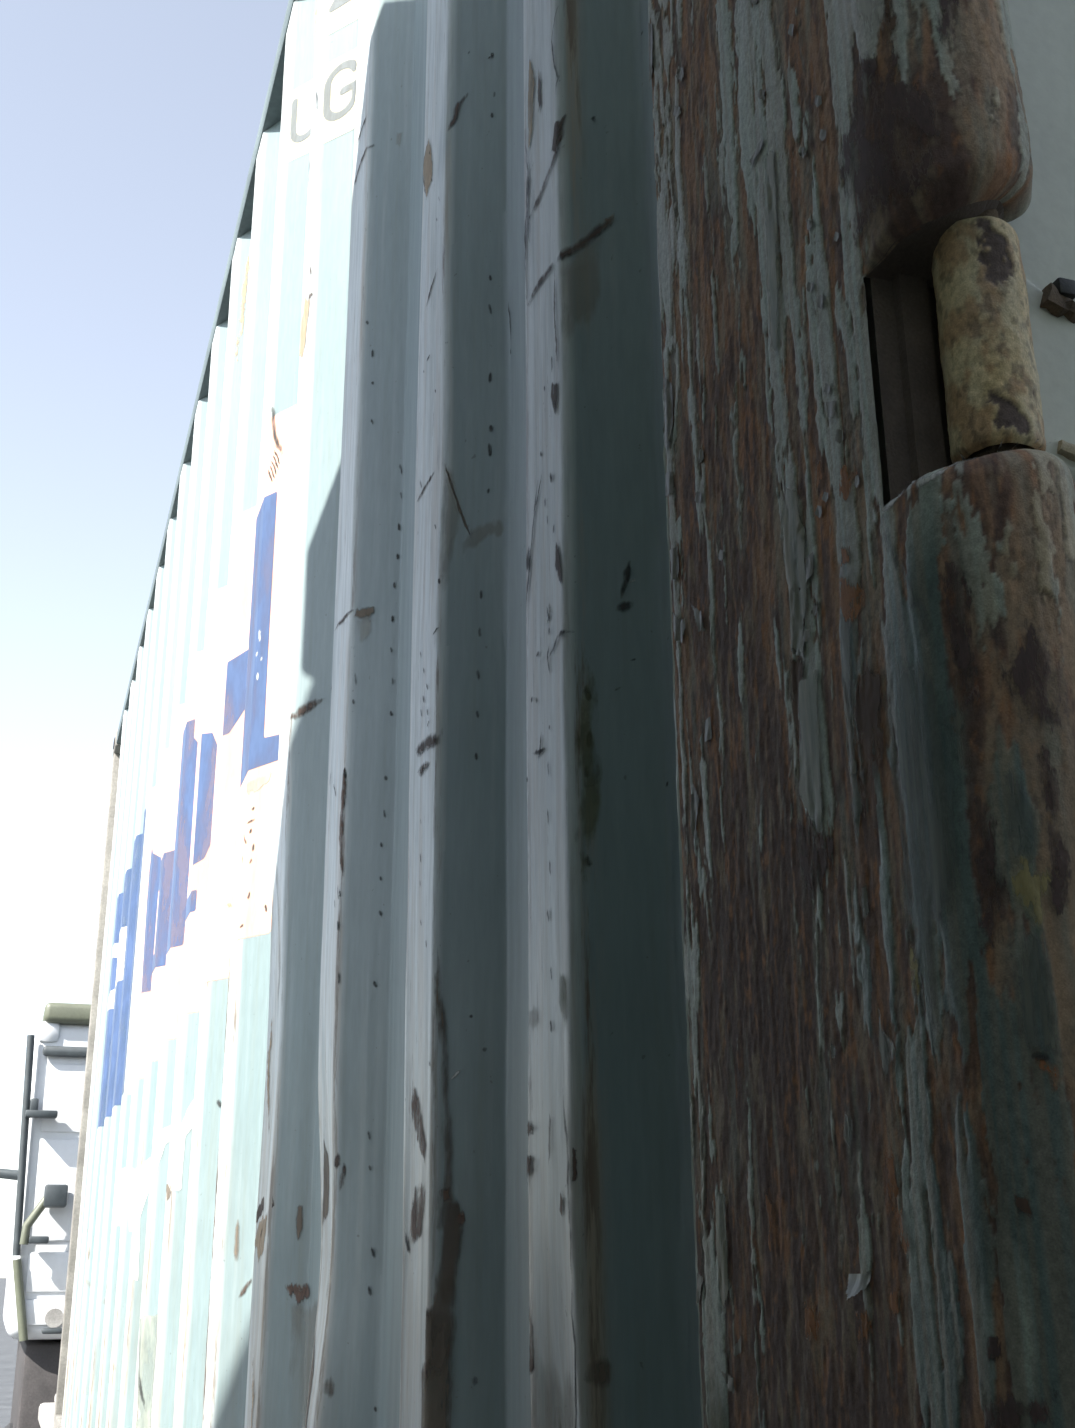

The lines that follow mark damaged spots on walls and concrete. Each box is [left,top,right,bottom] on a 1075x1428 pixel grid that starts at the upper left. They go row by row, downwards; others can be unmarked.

rust [884,0,897,32]
rust [1002,623,1071,915]
rust [435,970,447,1105]
rust [411,1089,426,1157]
rust [287,1283,310,1303]
rust [405,1122,465,1428]
peeling [846,1272,871,1299]
rust [305,1340,315,1428]